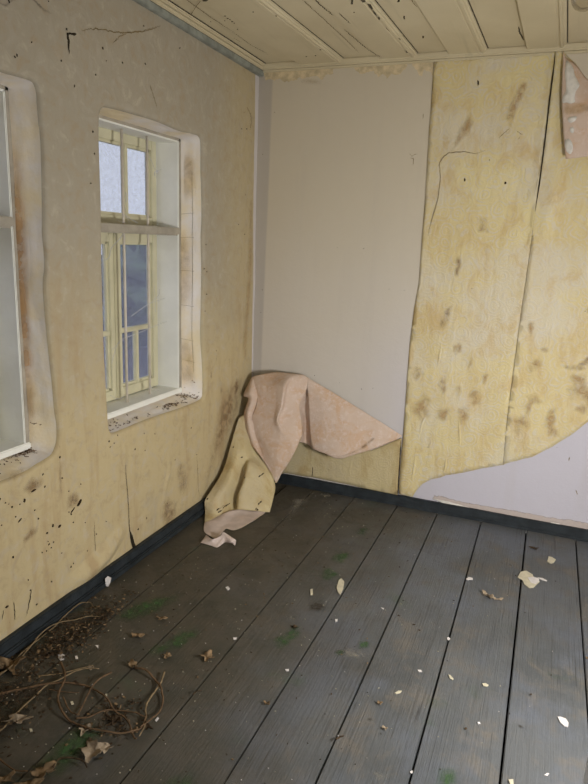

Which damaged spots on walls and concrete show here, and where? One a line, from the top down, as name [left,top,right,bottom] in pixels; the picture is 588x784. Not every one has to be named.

crack [82,26,160,42]
peeling [562,51,588,159]
crack [429,150,485,229]